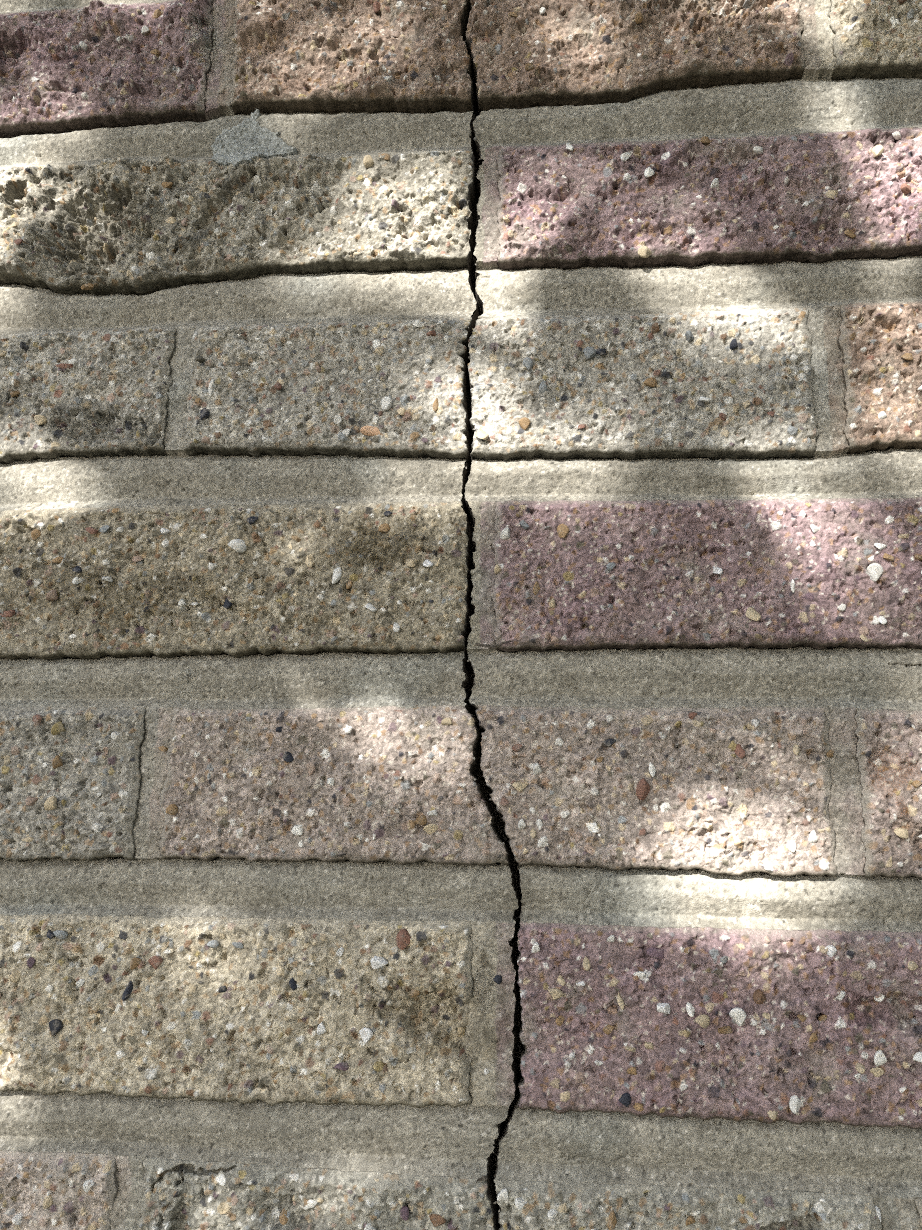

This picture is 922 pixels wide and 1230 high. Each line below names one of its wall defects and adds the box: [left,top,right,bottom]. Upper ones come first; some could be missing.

crack [460,0,526,1230]